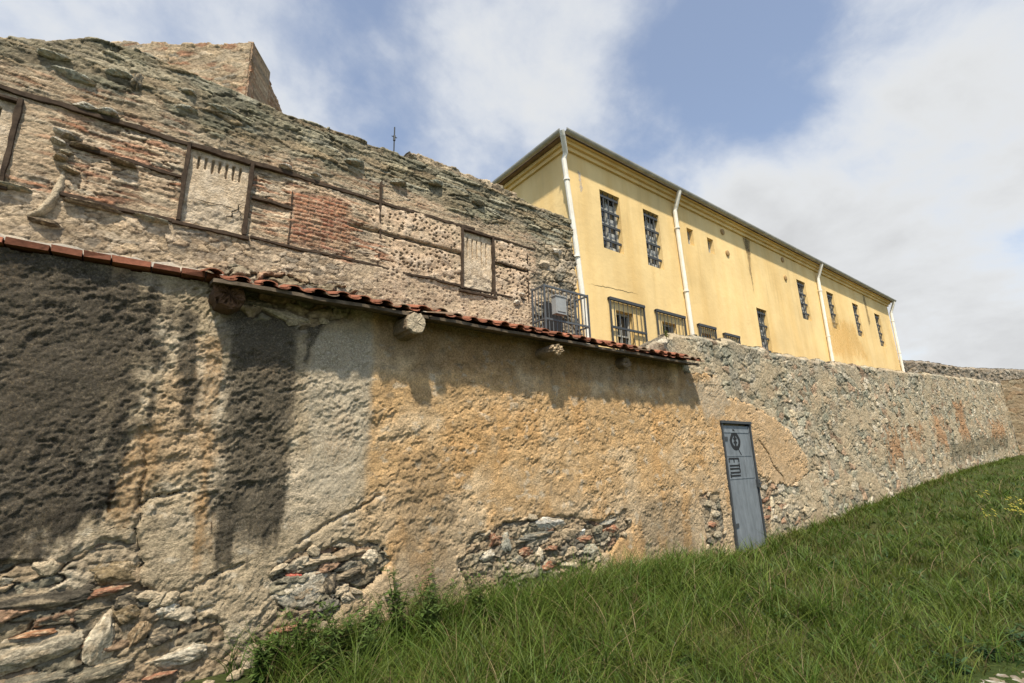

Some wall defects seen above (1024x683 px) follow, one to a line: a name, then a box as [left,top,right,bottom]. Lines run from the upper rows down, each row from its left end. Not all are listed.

spalling [0,540,242,683]
spalling [251,542,389,646]
spalling [458,510,632,597]
spalling [699,492,727,557]
spalling [758,475,807,540]